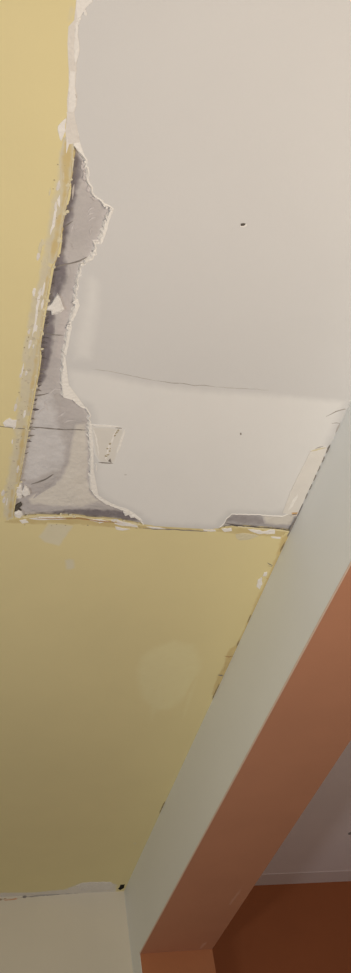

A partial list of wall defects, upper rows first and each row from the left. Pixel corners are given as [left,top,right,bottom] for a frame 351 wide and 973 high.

flaking render [3,0,351,699]